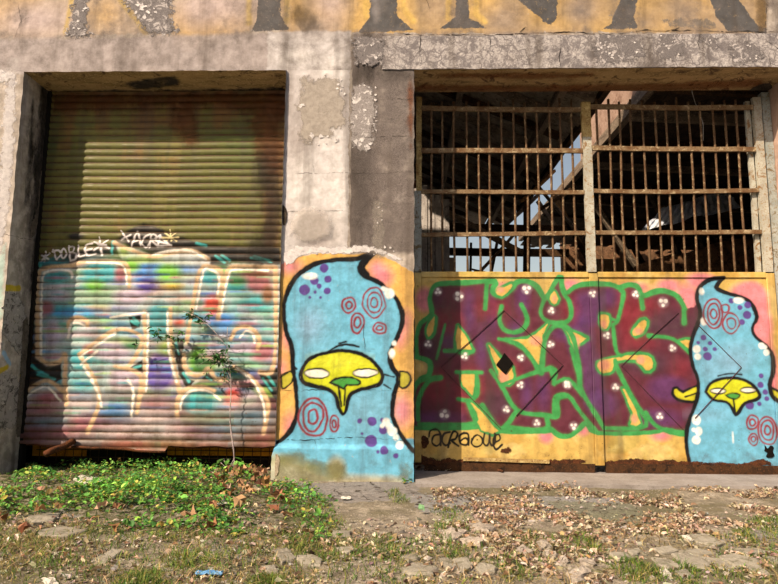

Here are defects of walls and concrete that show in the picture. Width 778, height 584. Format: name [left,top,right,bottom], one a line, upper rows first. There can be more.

peeling [63,0,94,40]
peeling [119,0,180,37]
crack [388,8,778,65]
peeling [294,75,379,151]
peeling [0,69,16,245]
damp [25,77,285,228]
corrosion [605,458,771,466]